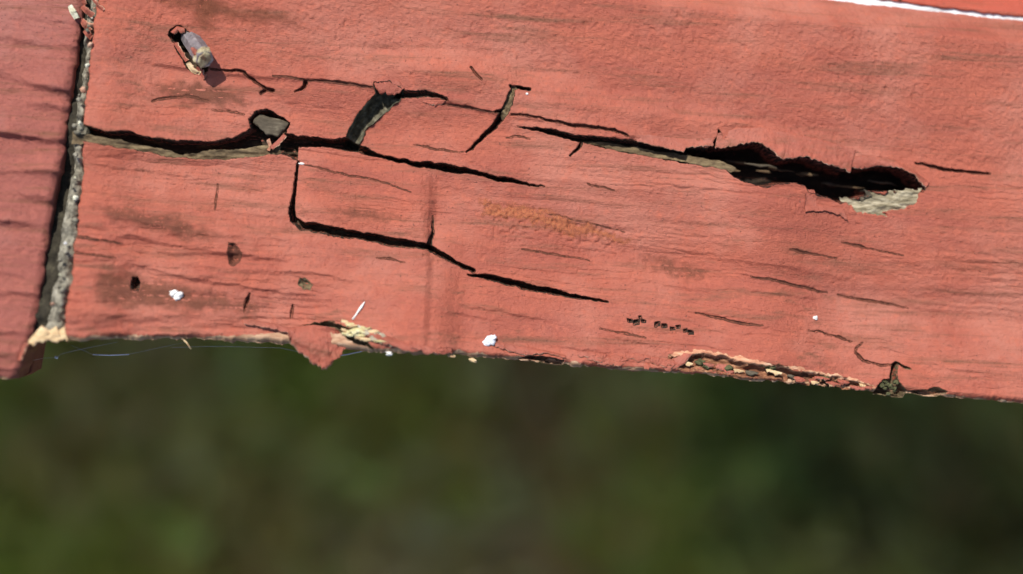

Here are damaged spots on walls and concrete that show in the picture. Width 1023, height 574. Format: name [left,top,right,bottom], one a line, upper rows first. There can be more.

crack [915,162,991,175]
crack [71,68,609,303]
crack [587,183,615,191]
crack [549,214,625,233]
crack [601,328,646,339]